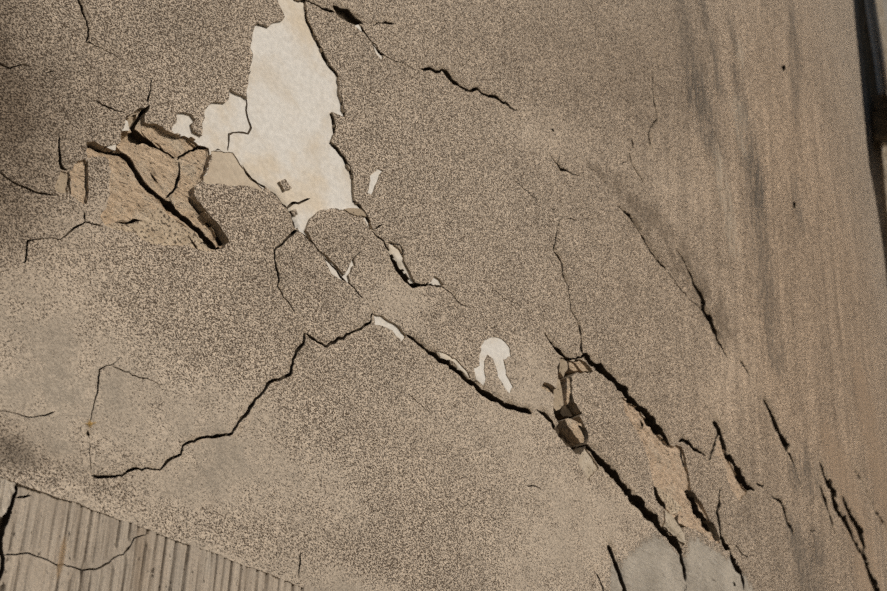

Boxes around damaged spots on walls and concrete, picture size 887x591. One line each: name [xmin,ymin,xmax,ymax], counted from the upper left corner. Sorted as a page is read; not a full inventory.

peeling [55,0,370,251]
crack [300,0,401,77]
crack [421,67,516,111]
crack [353,201,467,307]
crack [86,313,372,479]
peeling [438,337,512,393]
crack [406,335,554,429]
flaking render [542,358,597,479]
flaking render [622,399,718,544]
crack [545,315,883,591]
flaking render [716,440,746,500]
crack [0,485,144,579]